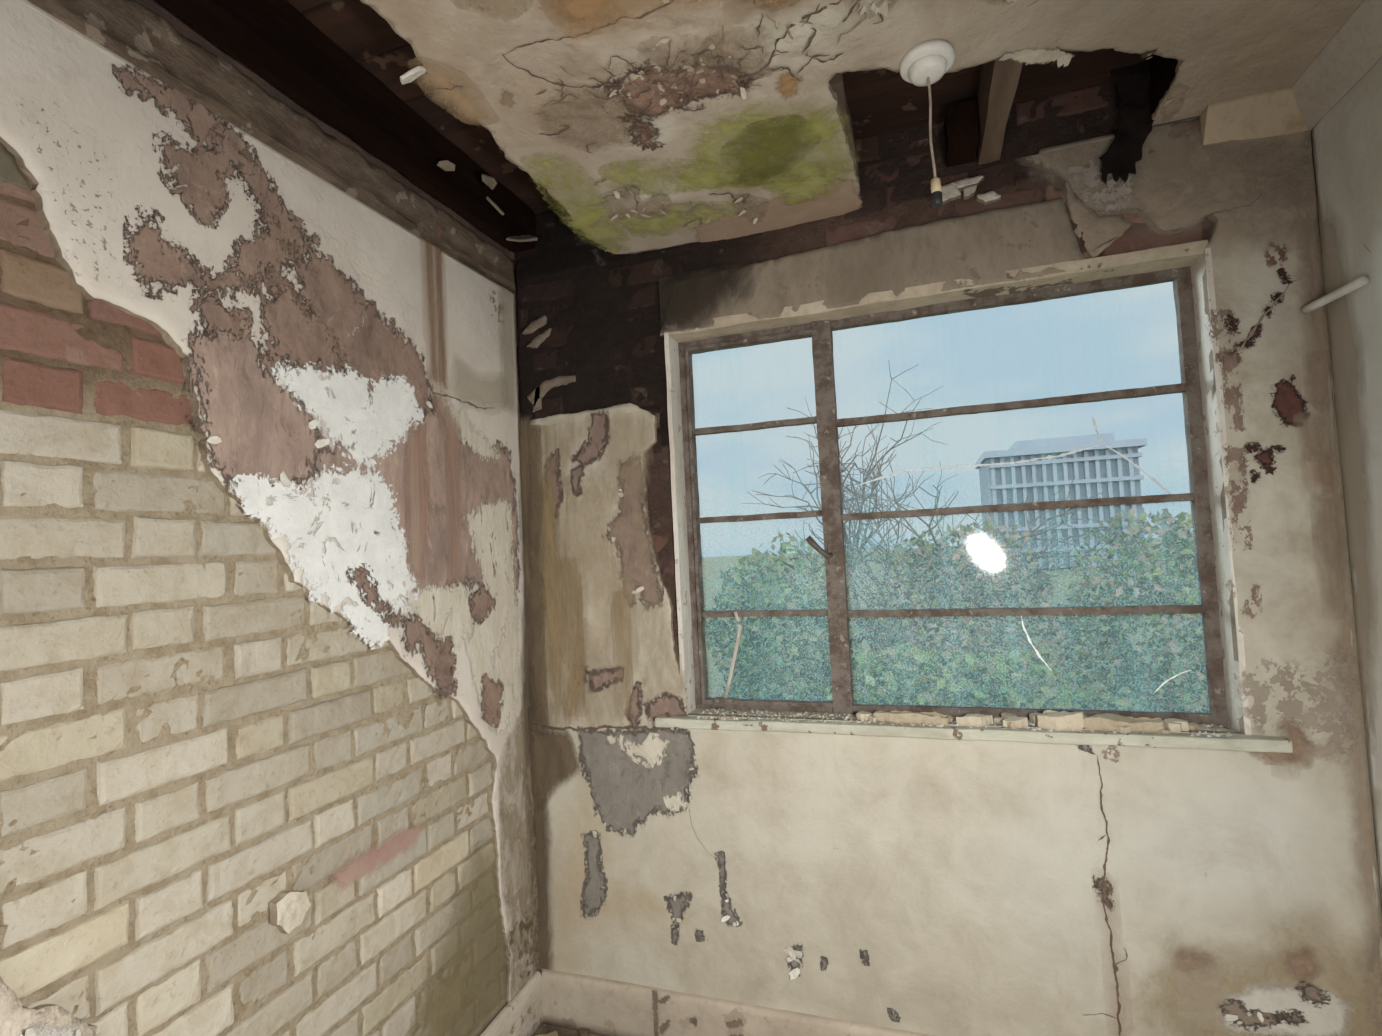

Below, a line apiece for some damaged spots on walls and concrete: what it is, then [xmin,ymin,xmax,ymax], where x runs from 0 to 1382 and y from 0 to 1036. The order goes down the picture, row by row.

water stain [422,69,486,120]
flaking render [544,31,767,151]
crack [502,0,884,227]
water stain [777,73,801,98]
spalling [516,79,1214,669]
peeling [1208,309,1287,551]
peeling [1270,374,1311,428]
spalling [0,63,522,1036]
peeling [573,662,700,920]
peeling [715,851,743,927]
crack [1085,751,1128,1036]
peeling [1216,980,1331,1032]